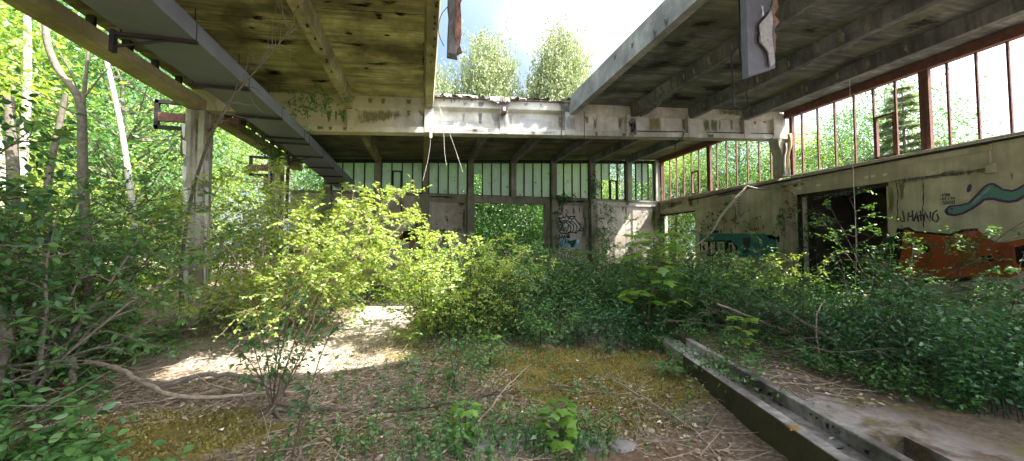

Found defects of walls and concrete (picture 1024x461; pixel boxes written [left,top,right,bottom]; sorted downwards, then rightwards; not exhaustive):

mould [352,0,405,19]
water stain [619,67,741,136]